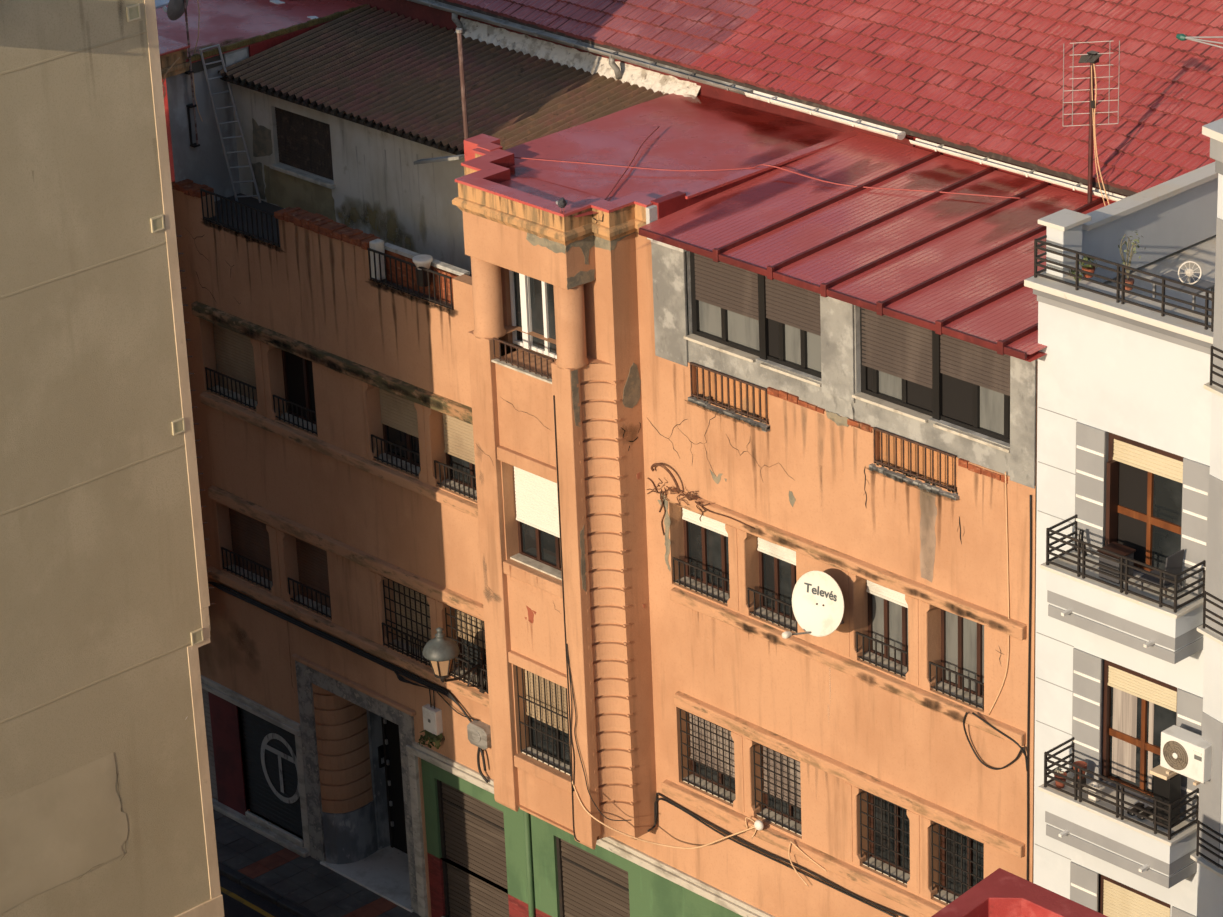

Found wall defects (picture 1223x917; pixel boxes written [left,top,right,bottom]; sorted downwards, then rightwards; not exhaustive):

water stain [369,281,456,320]
water stain [243,328,368,379]
peeling [623,362,641,408]
crack [647,415,792,481]
water stain [867,468,954,505]
water stain [950,605,975,619]